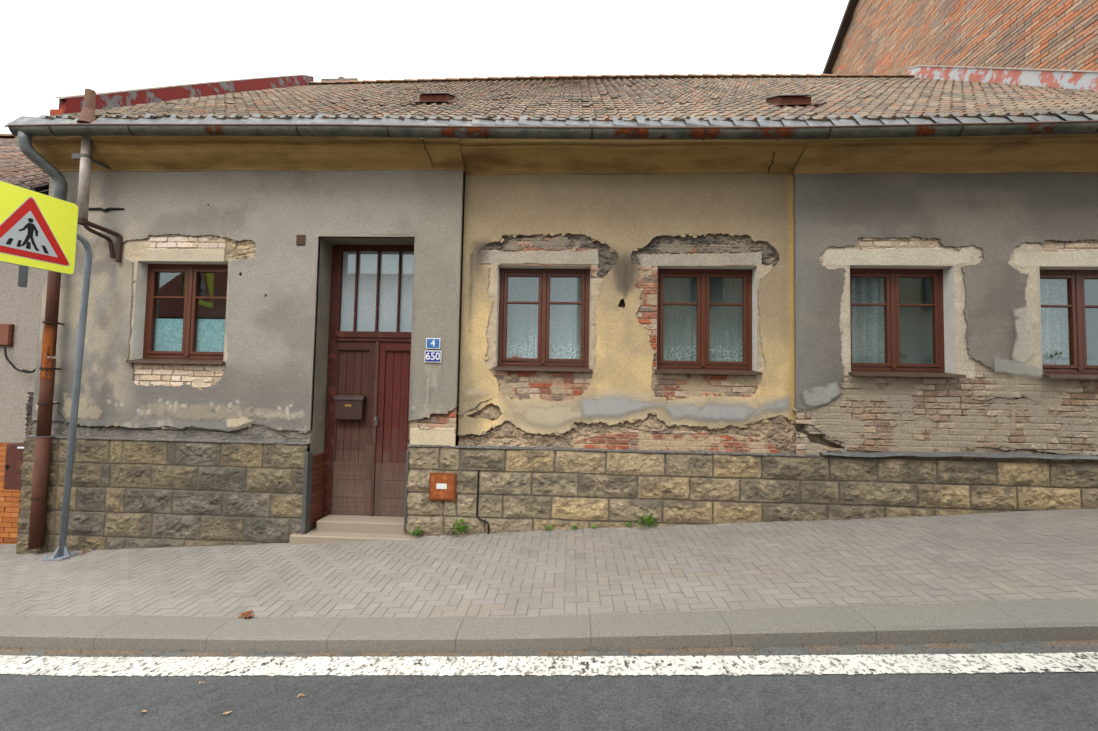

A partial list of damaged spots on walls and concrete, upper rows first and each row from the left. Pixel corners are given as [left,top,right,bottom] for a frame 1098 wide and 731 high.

crack [57,410,301,439]
flaking render [122,234,257,390]
flaking render [409,233,1098,464]